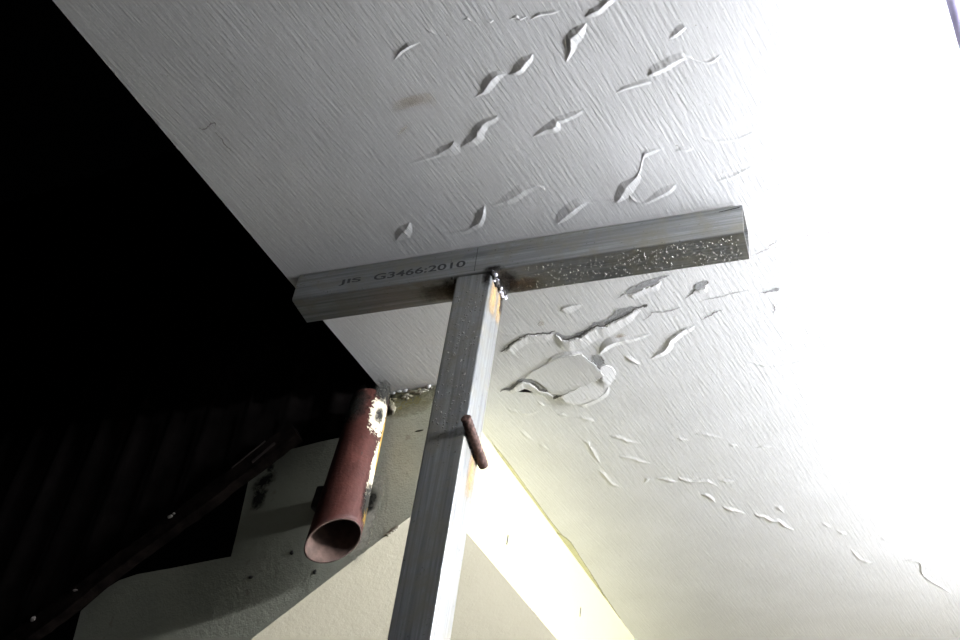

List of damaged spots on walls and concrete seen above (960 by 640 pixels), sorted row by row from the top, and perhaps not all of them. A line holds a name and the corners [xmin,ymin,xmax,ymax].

peeling [618,275,669,300]
peeling [686,280,709,298]
peeling [500,351,616,408]